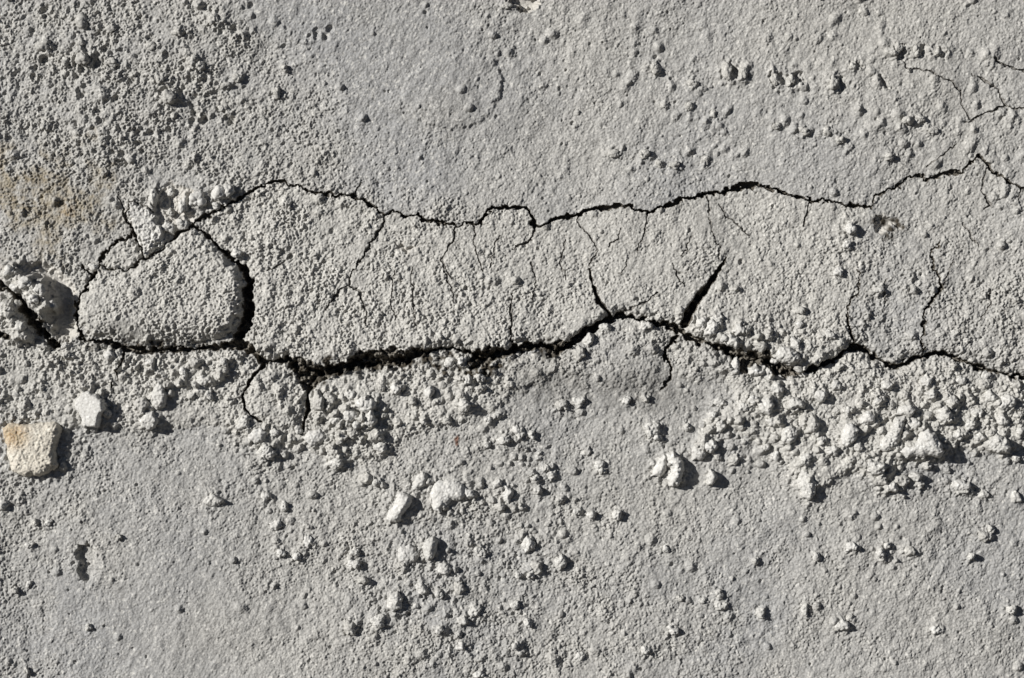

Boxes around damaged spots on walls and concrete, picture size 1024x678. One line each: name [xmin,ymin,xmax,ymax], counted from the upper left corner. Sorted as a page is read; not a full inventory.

crack [0,57,1024,435]